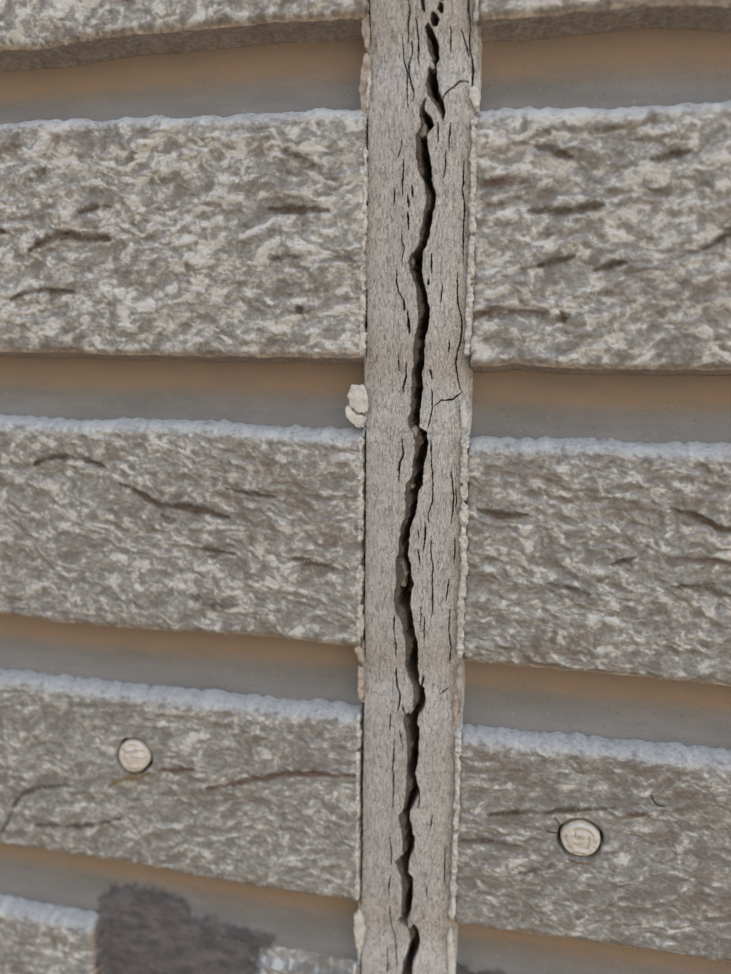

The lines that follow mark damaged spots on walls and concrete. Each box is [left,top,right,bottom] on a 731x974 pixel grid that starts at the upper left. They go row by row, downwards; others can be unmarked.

crack [387,0,473,974]